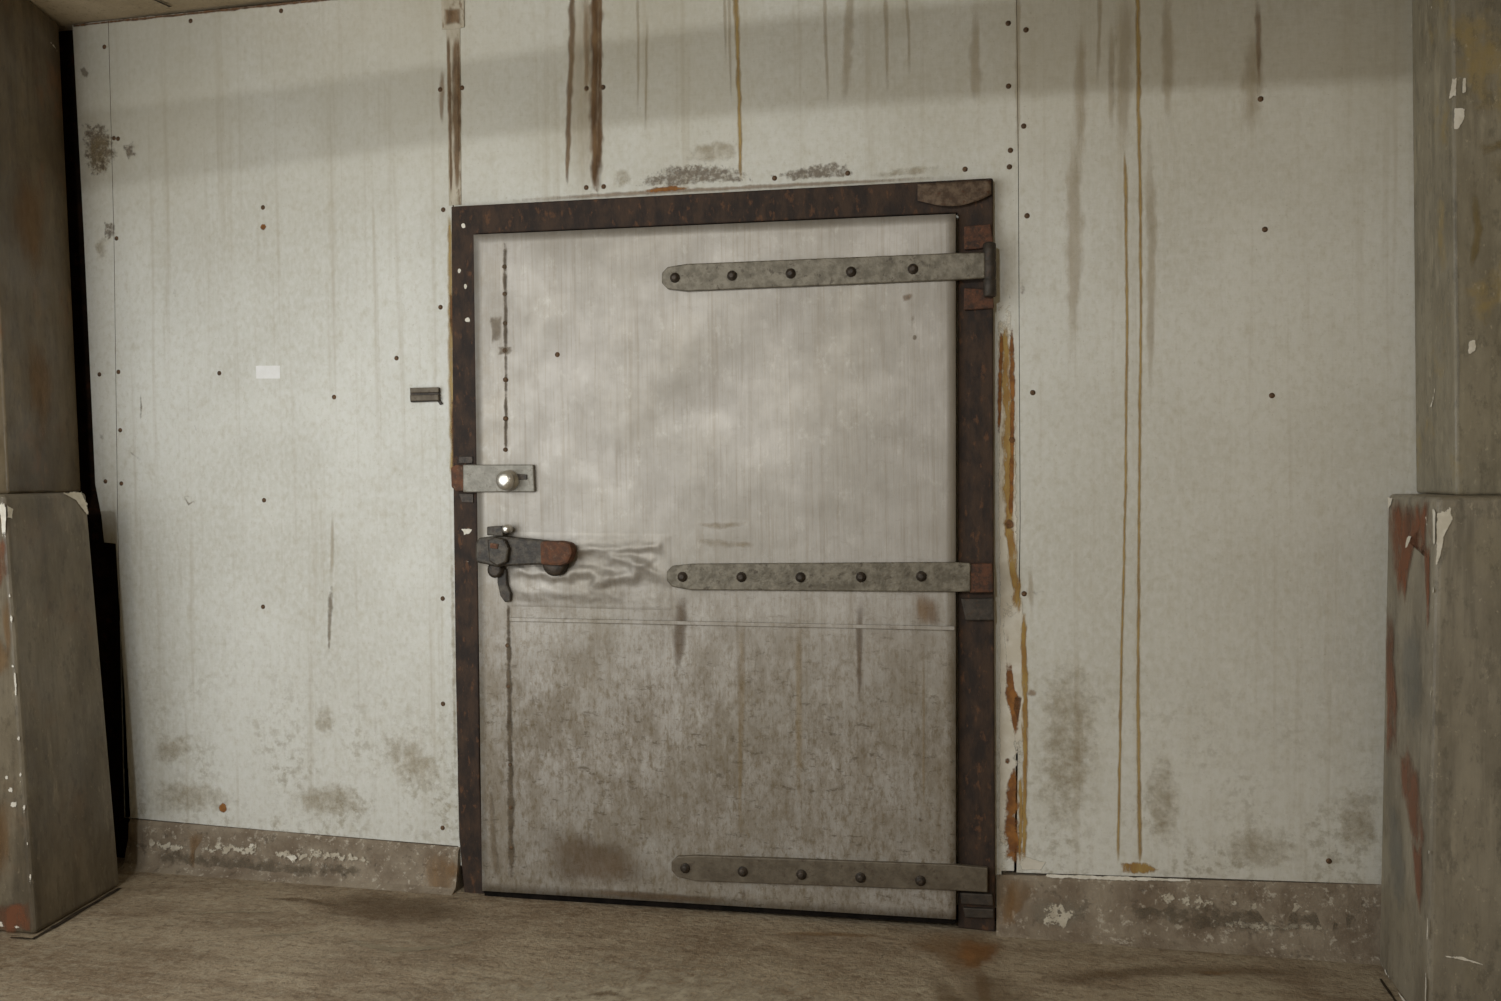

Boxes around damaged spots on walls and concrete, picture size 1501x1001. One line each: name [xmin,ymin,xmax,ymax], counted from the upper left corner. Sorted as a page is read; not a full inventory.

damp [85,125,135,170]
rust [446,10,459,24]
rust [447,43,460,188]
rust [566,0,602,185]
rust [734,0,742,173]
rust [491,249,509,447]
rust [1117,0,1155,874]
rust [997,331,1028,861]
rust [506,608,514,867]